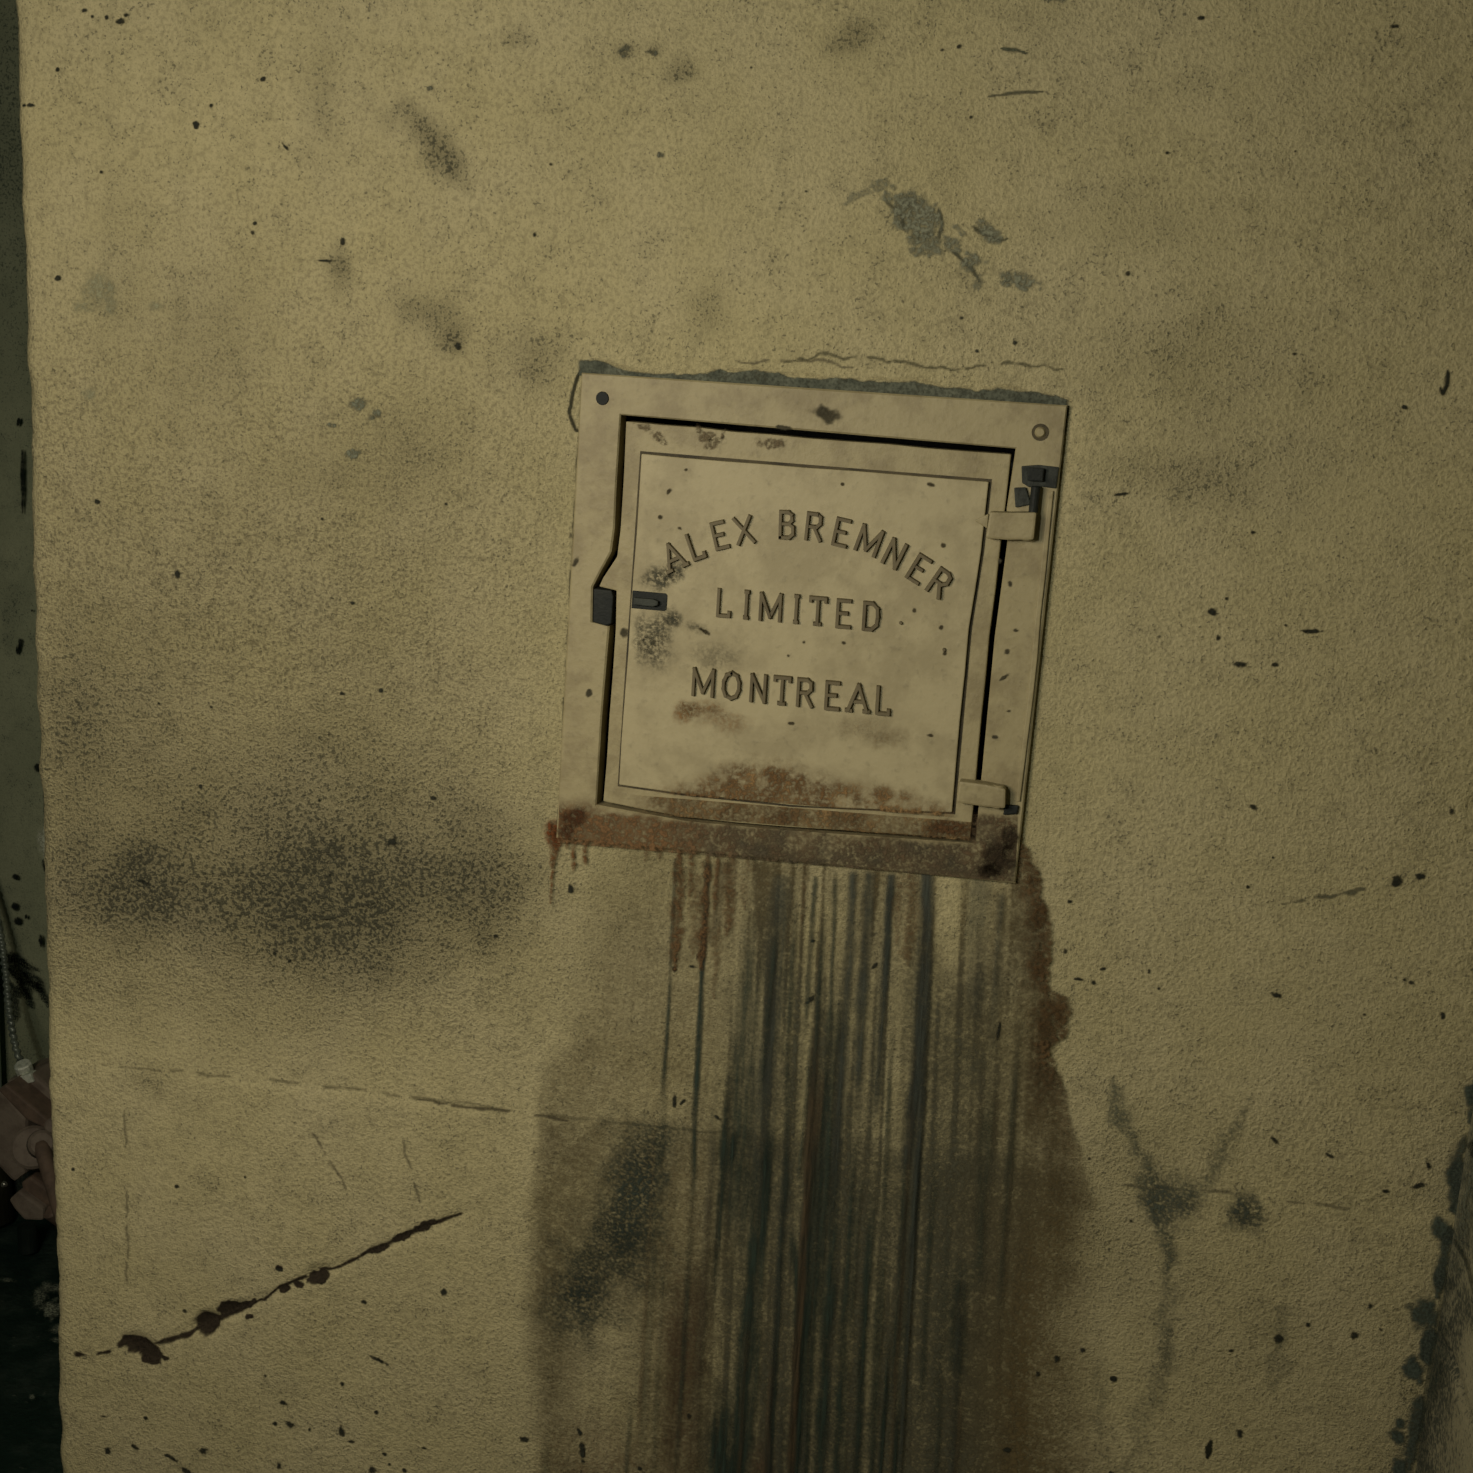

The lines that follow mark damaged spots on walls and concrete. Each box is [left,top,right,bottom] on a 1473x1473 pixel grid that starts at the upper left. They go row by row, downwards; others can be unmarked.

rust [545,766,1070,1120]
crack [75,1190,462,1365]
water stain [539,860,1080,1473]